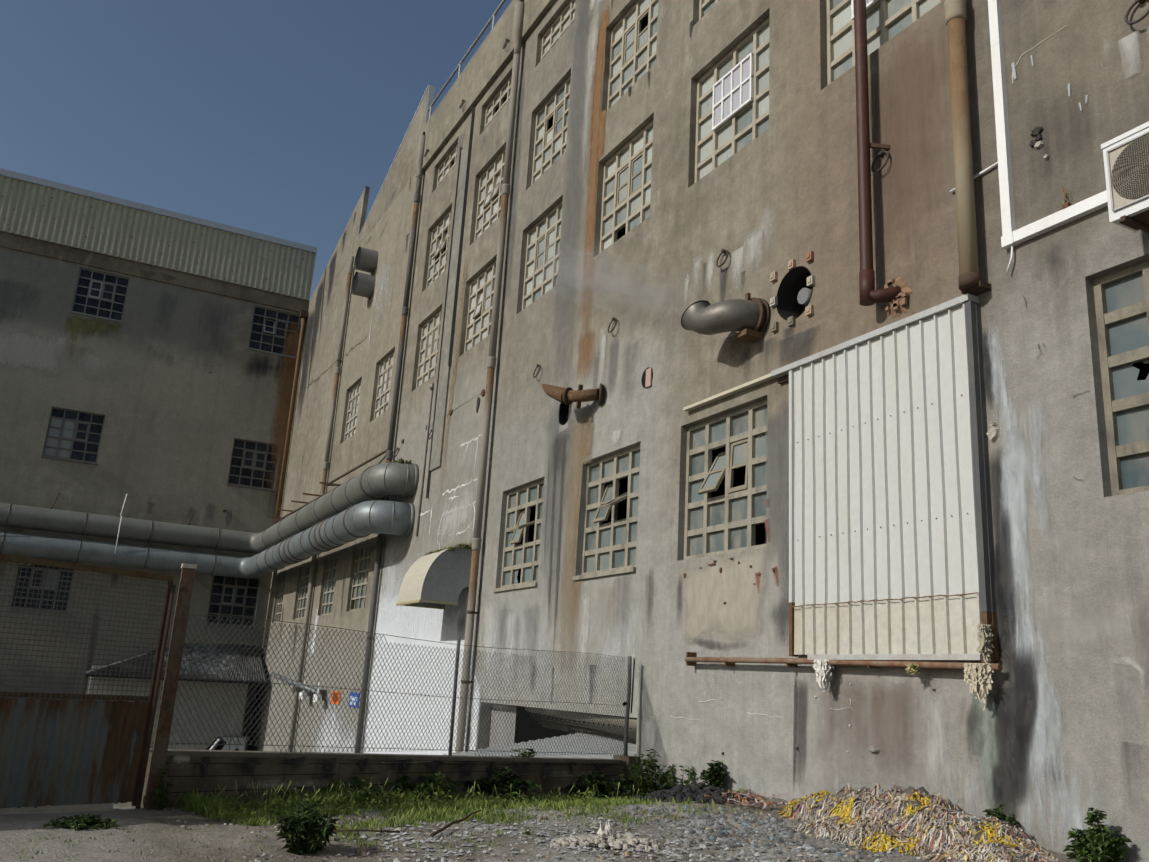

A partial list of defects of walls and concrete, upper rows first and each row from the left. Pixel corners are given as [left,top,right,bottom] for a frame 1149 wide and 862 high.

corrosion [583,9,609,319]
corrosion [273,325,305,499]
corrosion [578,334,591,370]
damp [968,333,1057,823]
damp [1061,793,1082,832]